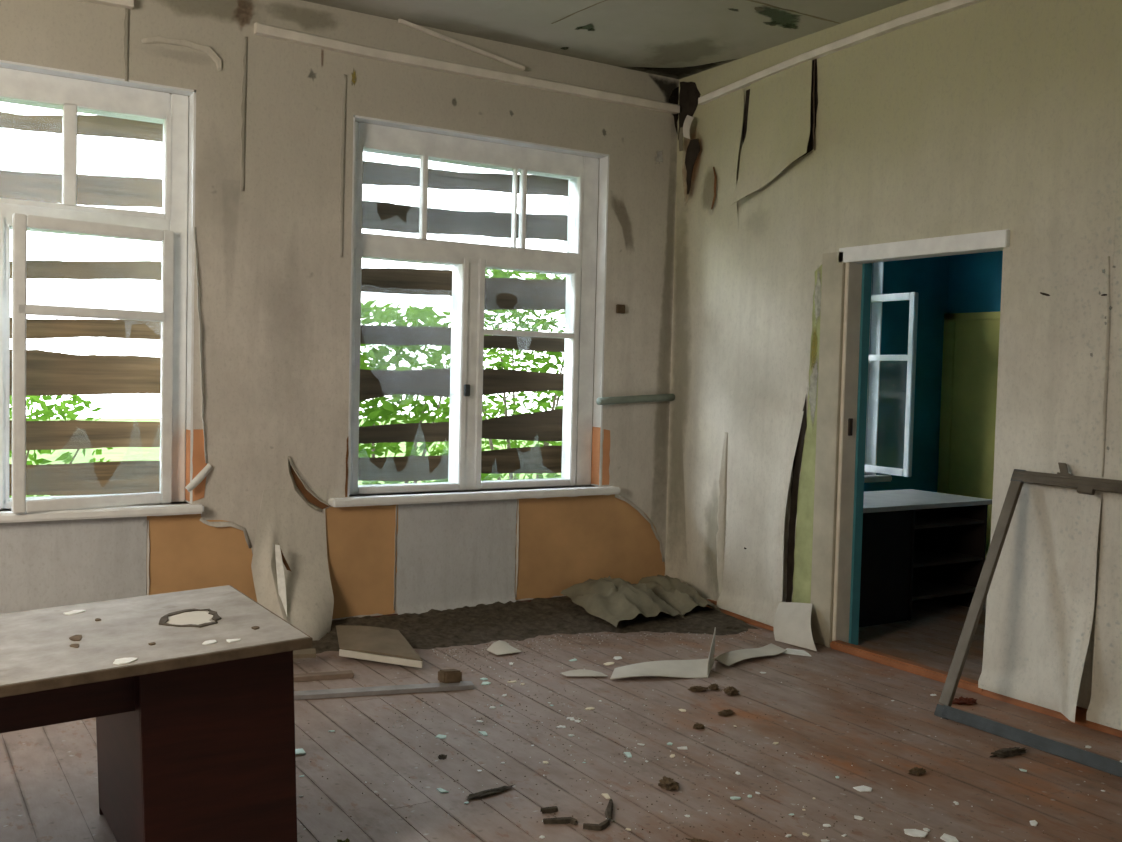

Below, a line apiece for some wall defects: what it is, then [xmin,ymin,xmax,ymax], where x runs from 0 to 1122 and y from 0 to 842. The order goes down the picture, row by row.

water stain [754,7,799,29]
spalling [678,81,701,194]
peeling [730,59,818,206]
peeling [325,438,398,619]
peeling [515,427,665,600]
peeling [792,265,822,603]